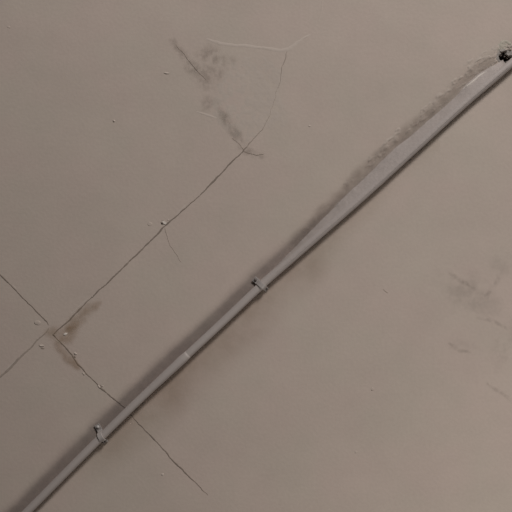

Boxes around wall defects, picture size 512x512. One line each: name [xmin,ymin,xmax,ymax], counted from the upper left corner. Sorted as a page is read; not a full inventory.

crack [0,52,287,495]